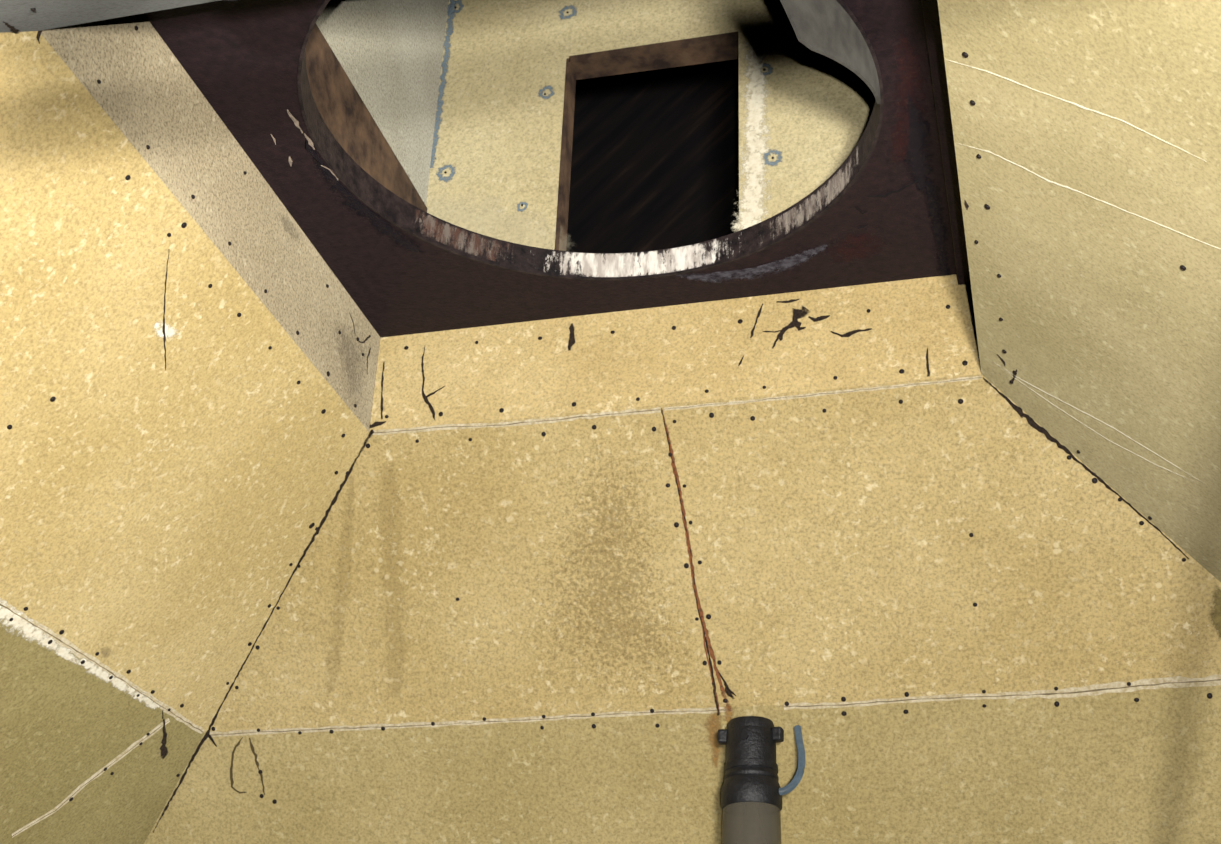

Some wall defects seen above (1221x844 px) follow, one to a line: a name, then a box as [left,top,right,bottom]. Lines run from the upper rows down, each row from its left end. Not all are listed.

crack [161,255,169,370]
crack [421,346,445,420]
crack [738,299,872,366]
crack [153,312,386,833]
rust [662,410,732,766]
crack [661,408,736,715]